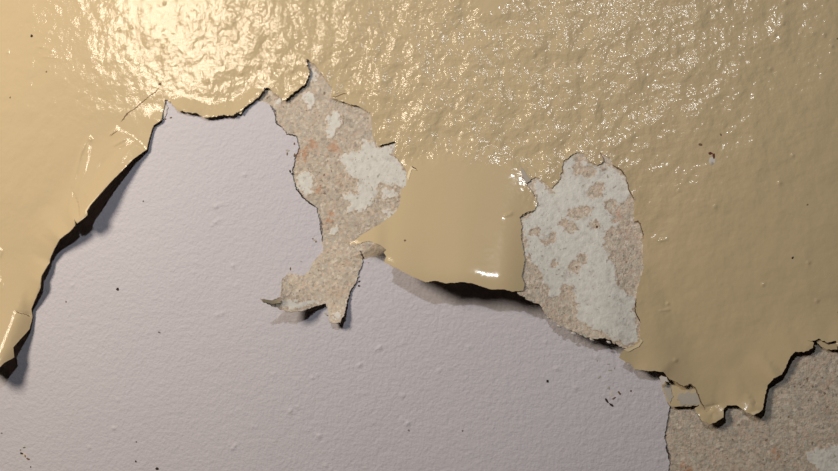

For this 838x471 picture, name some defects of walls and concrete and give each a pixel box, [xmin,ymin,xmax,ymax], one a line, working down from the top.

crack [112,87,159,135]
flaking render [0,45,407,367]
peeling [348,124,838,471]